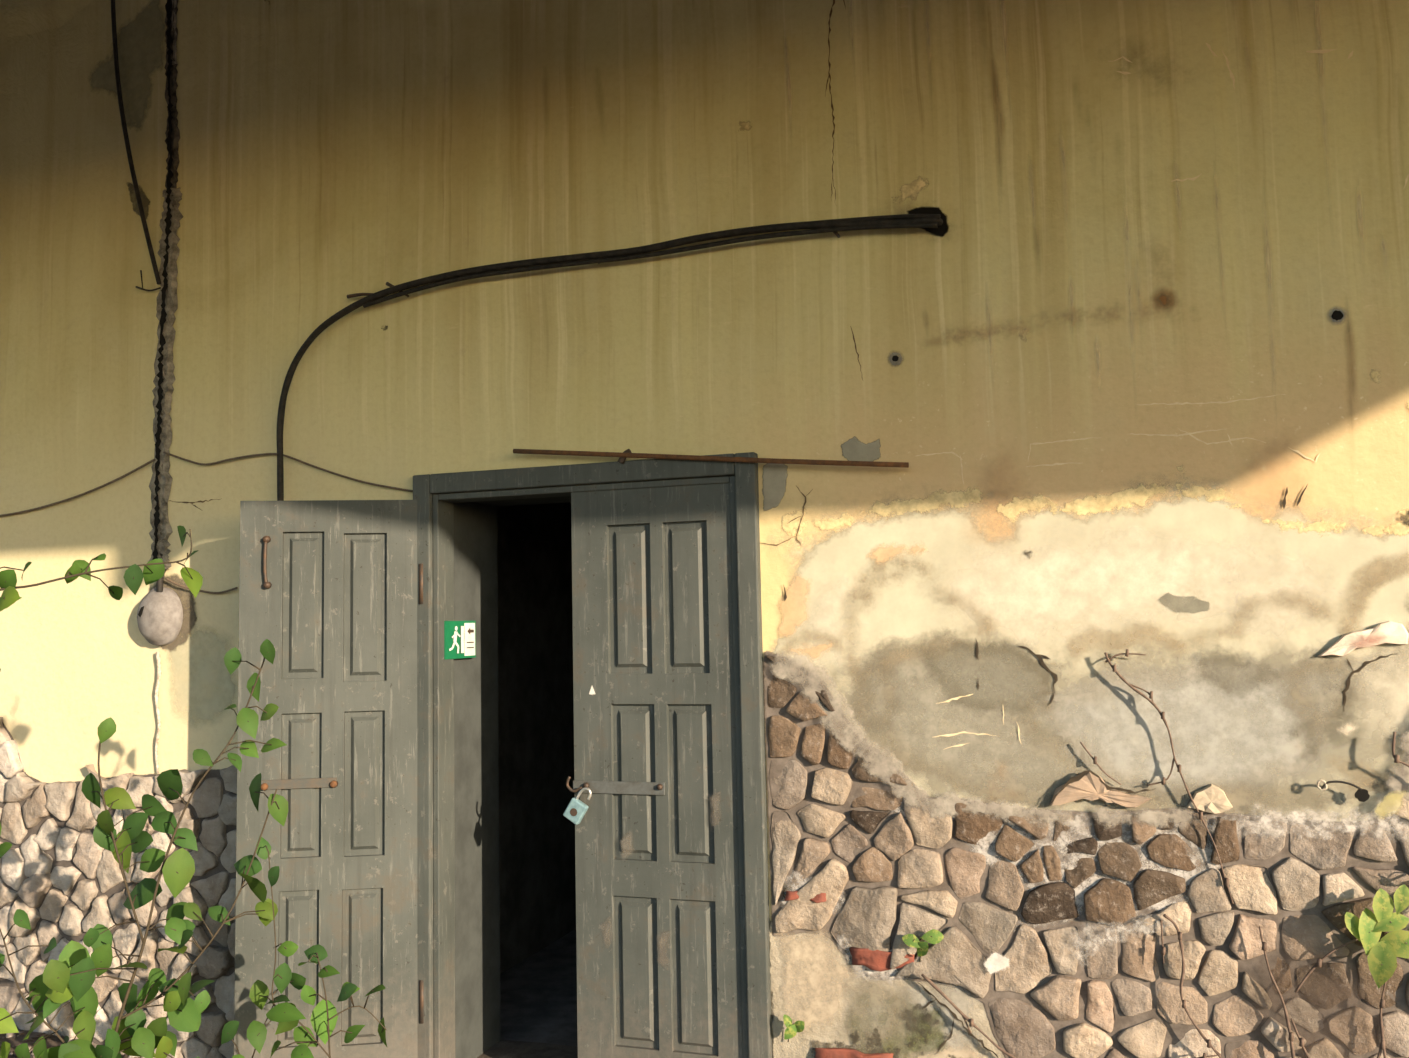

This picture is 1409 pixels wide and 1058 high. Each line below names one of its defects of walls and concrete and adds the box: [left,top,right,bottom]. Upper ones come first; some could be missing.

crack [825,0,846,201]
corrosion [1156,293,1172,308]
spalling [841,436,881,461]
peeling [762,463,1409,822]